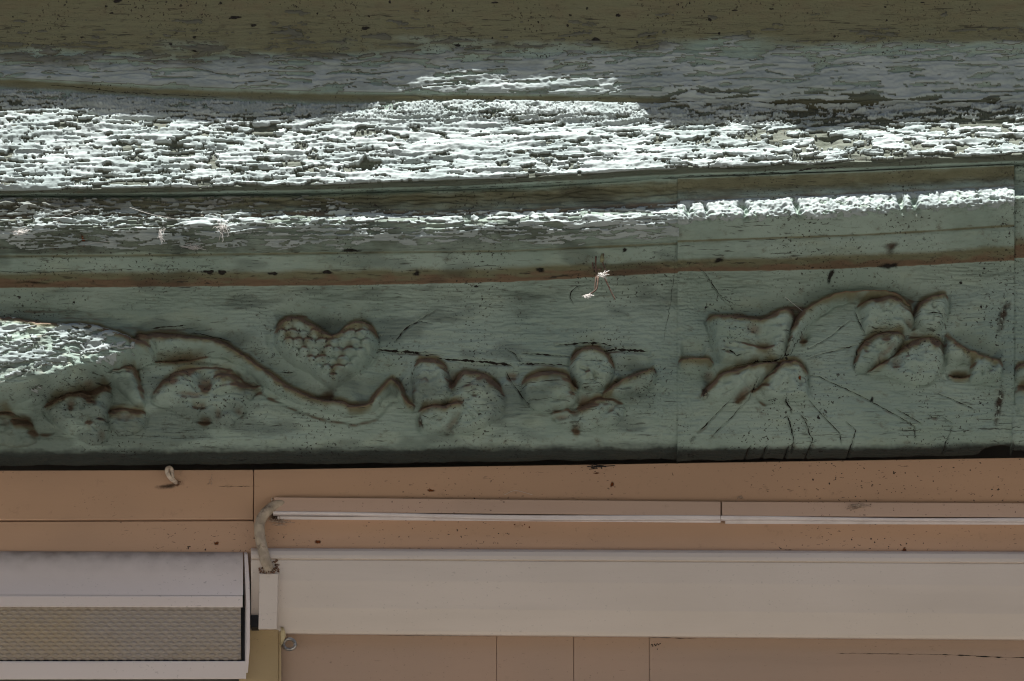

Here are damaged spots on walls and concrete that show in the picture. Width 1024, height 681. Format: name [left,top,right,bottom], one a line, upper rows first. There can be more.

peeling [0,10,1024,250]
peeling [0,316,136,378]
crack [379,251,676,409]
crack [692,313,971,457]